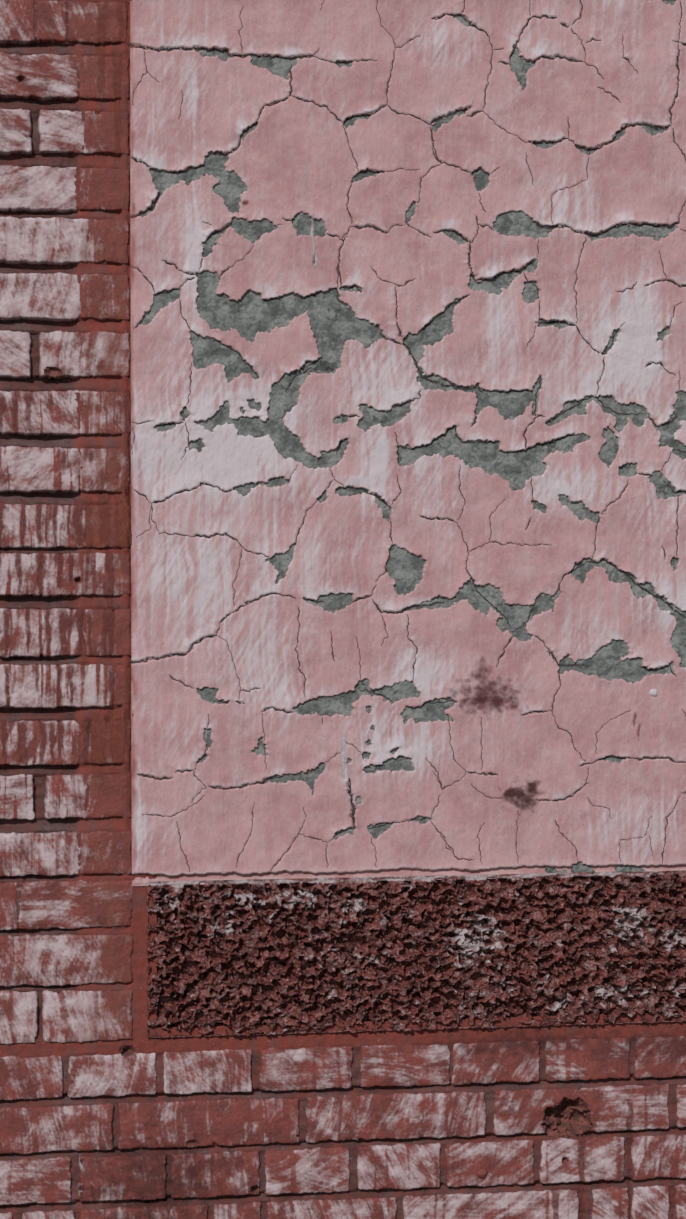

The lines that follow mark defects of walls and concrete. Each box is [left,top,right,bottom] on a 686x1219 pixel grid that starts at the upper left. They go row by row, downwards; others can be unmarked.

peeling [500,7,604,90]
crack [127,0,686,337]
crack [549,320,625,395]
crack [645,362,681,391]
crack [131,420,189,459]
crack [133,464,298,538]
peeling [131,146,686,795]
crack [335,467,549,582]
crack [129,593,296,704]
crack [331,615,389,679]
crack [137,770,207,872]
crack [269,671,686,873]